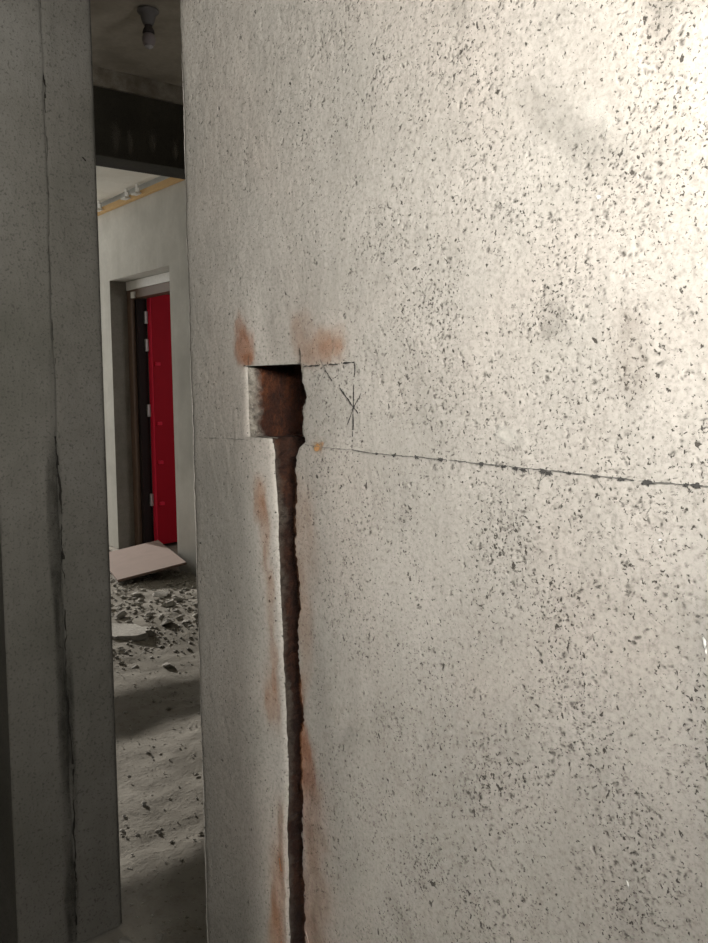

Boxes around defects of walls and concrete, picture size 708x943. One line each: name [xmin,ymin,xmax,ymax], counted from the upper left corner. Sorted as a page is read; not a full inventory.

crack [54,436,65,579]
crack [59,610,77,935]